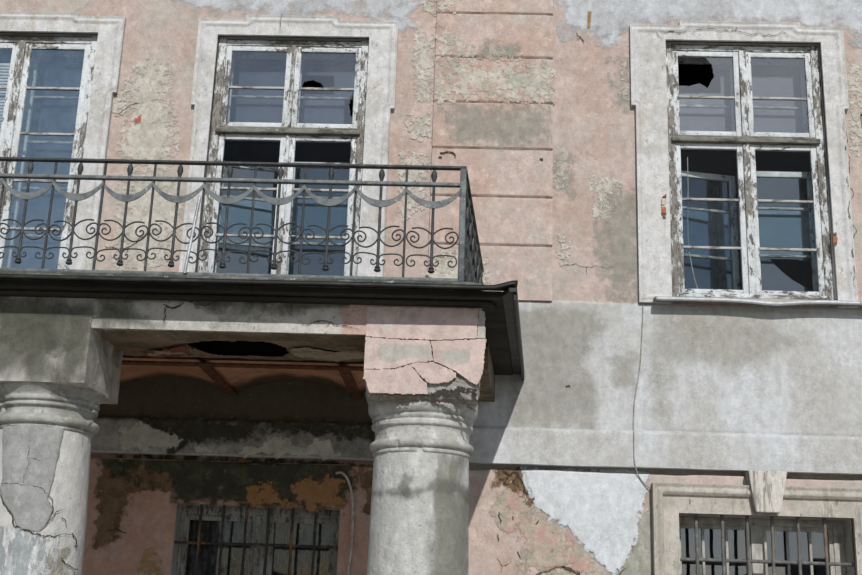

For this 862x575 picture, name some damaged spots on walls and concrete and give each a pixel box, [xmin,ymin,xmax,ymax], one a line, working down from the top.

peeling [182,0,556,142]
peeling [553,0,862,48]
peeling [110,56,184,271]
peeling [396,150,430,222]
crack [301,307,486,395]
flaking render [0,425,70,575]
crack [0,448,79,575]
spalling [92,420,183,550]
damp [98,413,375,514]
peeling [233,435,342,463]
peeling [489,467,653,575]